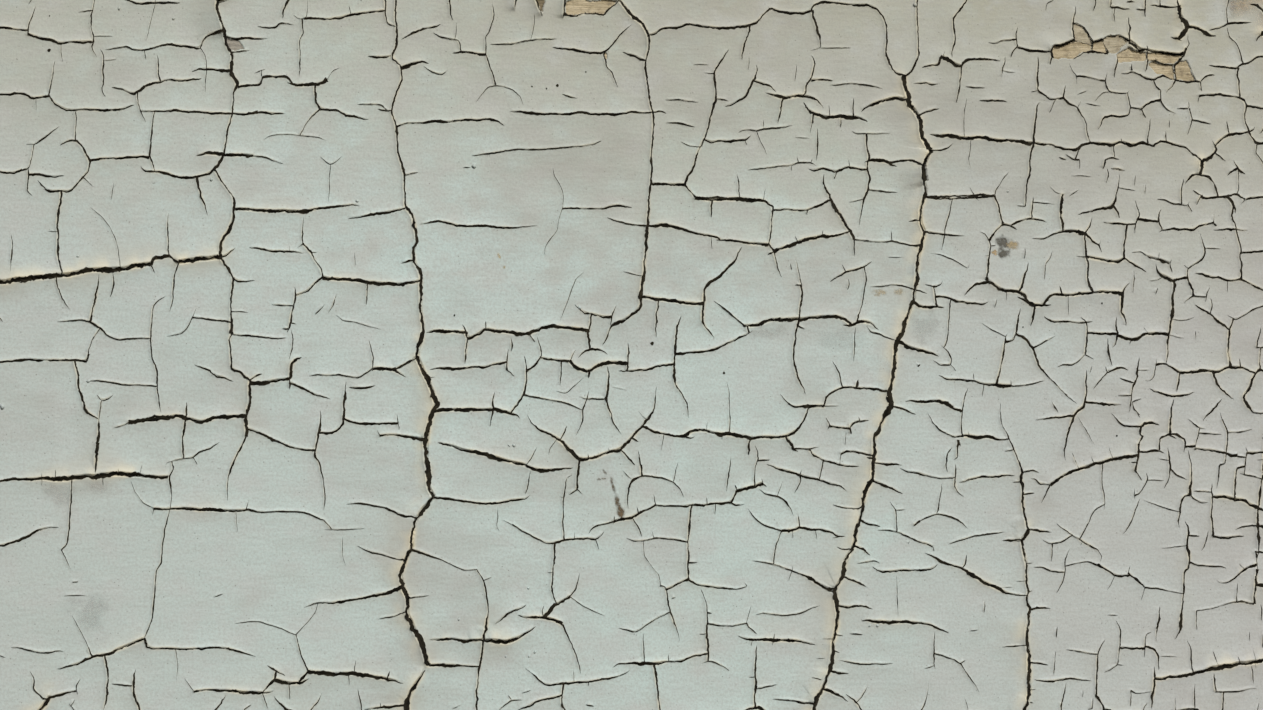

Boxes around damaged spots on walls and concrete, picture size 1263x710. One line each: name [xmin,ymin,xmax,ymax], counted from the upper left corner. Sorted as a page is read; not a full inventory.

peeling [566,0,616,15]
crack [112,56,201,99]
crack [552,25,631,87]
peeling [1052,23,1195,81]
crack [463,141,600,168]
crack [922,0,1263,291]
crack [423,220,537,229]
crack [0,527,58,547]
crack [512,475,793,635]
crack [499,578,602,673]
crack [1106,609,1263,710]
crack [518,670,627,710]